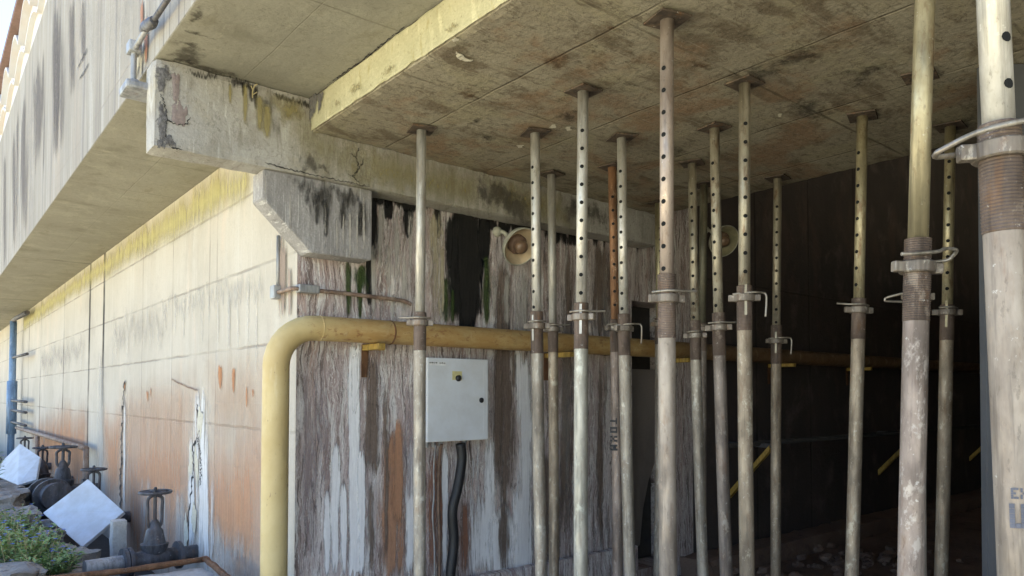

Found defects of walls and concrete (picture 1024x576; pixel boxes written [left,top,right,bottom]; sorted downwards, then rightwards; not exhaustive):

spalling [155,65,188,149]
leakage [171,32,310,136]
crack [267,148,370,187]
leakage [289,158,531,331]
leakage [568,200,605,223]
rust [218,366,254,407]
crack [118,382,126,506]
crack [172,379,204,546]